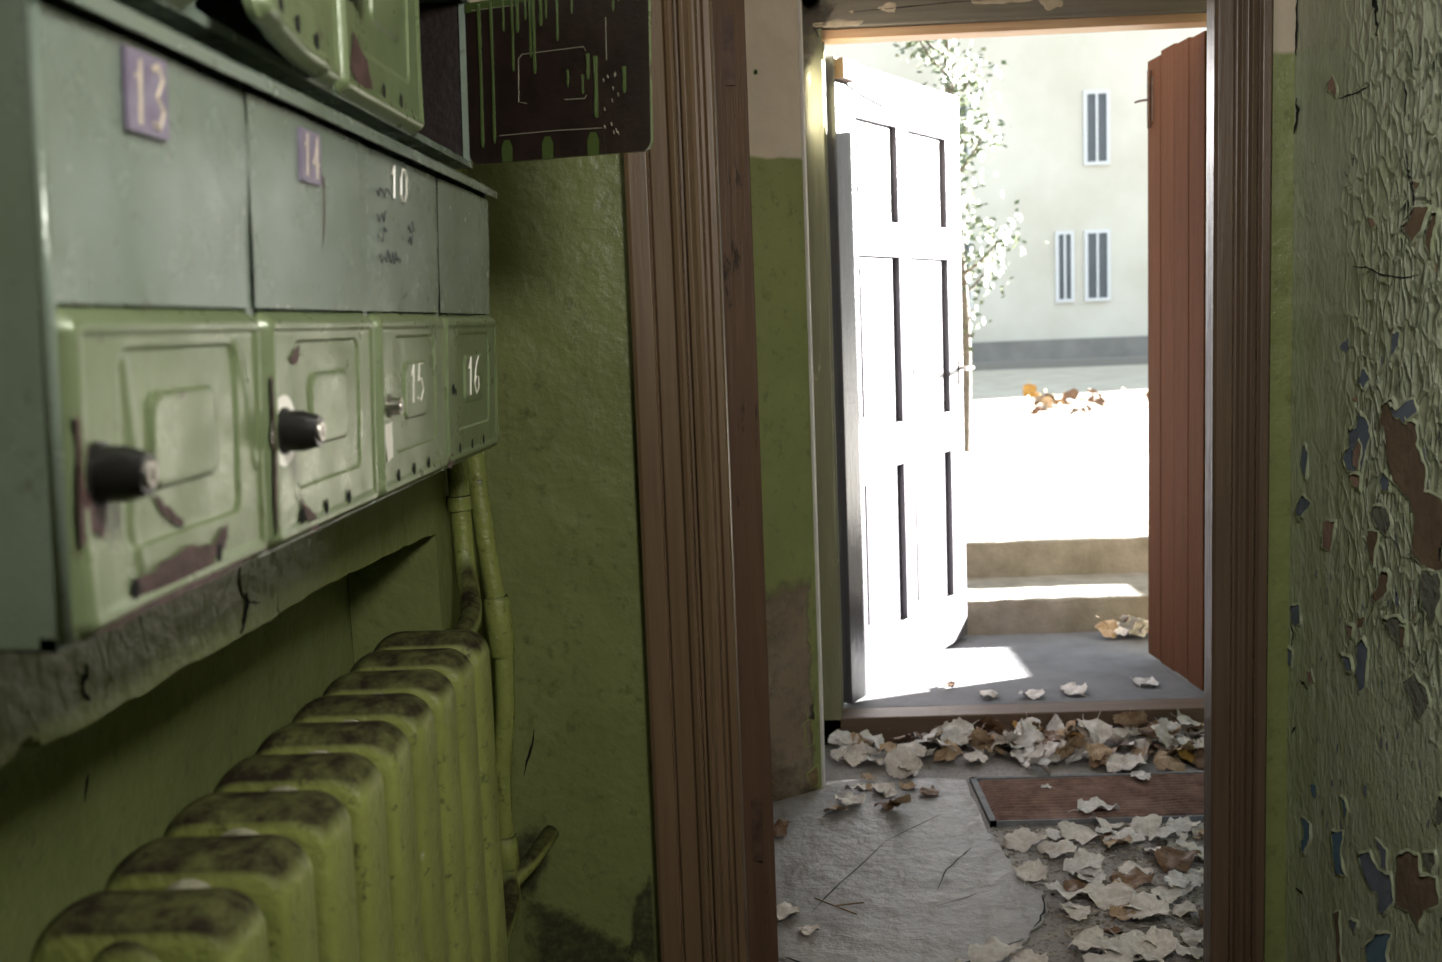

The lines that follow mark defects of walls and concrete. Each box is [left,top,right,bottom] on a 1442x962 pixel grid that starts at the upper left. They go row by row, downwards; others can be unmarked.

peeling [971,0,1063,11]
peeling [1391,179,1442,273]
peeling [1287,328,1442,724]
peeling [766,582,819,802]
water stain [518,835,654,962]
peeling [1300,772,1442,962]